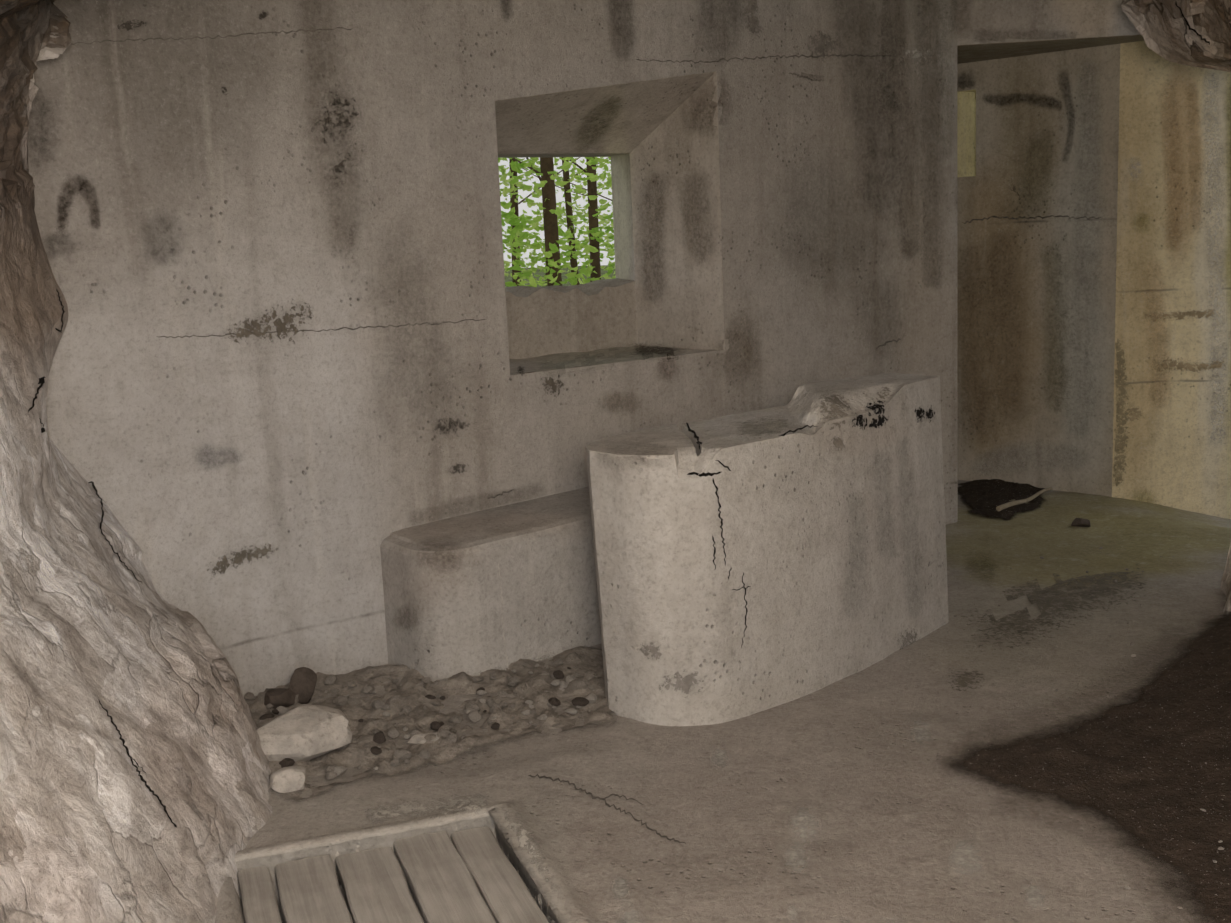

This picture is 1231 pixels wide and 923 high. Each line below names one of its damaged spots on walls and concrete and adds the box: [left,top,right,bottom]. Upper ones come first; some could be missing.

leakage [316,92,358,144]
spalling [819,391,851,450]
crack [686,422,751,648]
crack [528,774,686,844]